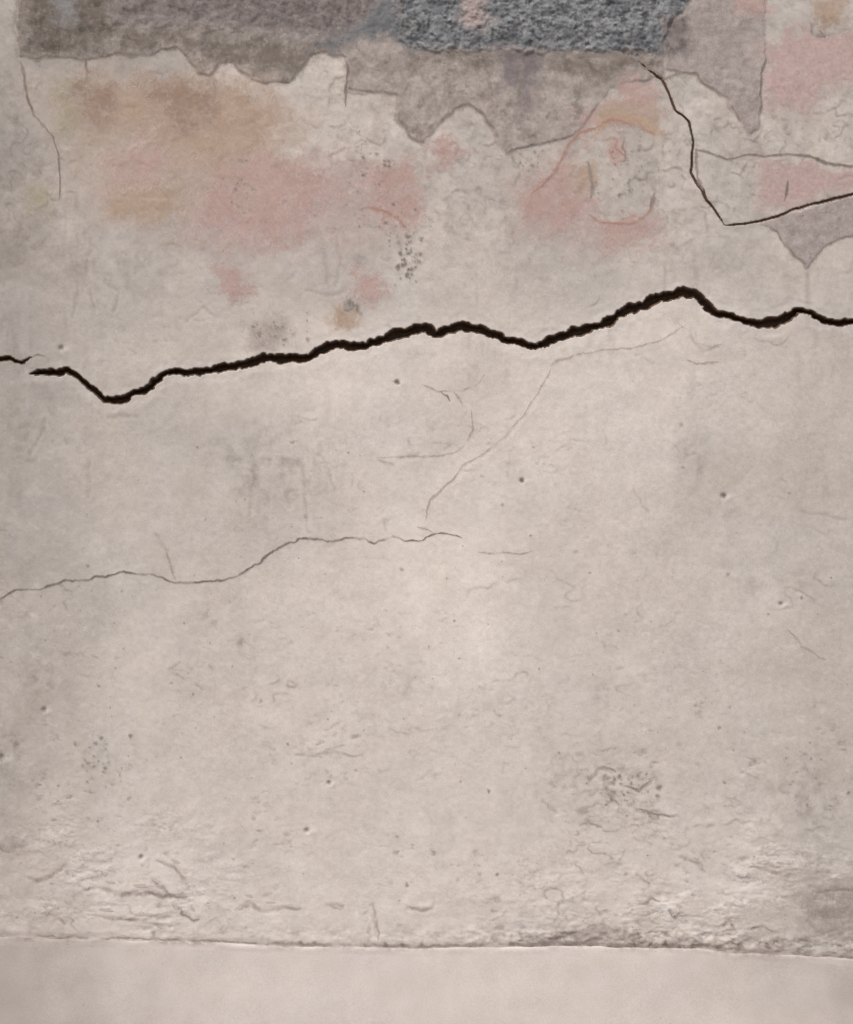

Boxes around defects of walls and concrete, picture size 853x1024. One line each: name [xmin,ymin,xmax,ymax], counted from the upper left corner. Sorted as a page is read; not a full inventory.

peeling [16,0,766,193]
crack [640,62,853,226]
peeling [764,197,853,269]
crack [0,286,853,425]
crack [0,385,488,599]